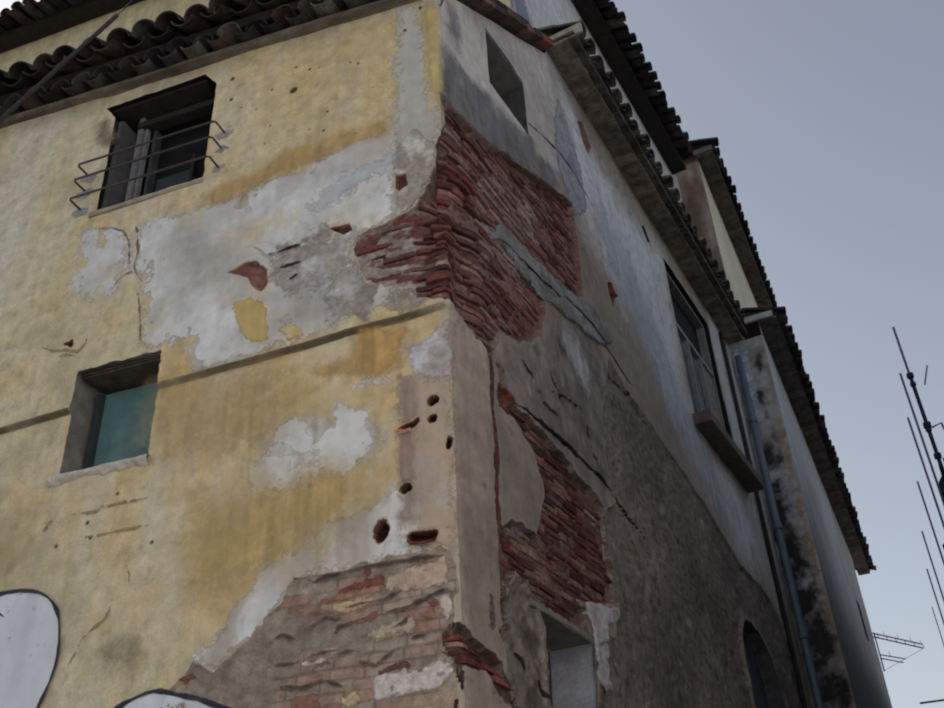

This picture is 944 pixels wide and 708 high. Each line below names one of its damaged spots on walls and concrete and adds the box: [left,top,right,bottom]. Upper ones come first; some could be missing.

flaking render [65,1,802,708]
crack [488,338,648,539]
mould [732,344,763,404]
mould [763,443,784,468]
crack [499,588,507,613]
mould [769,480,853,708]